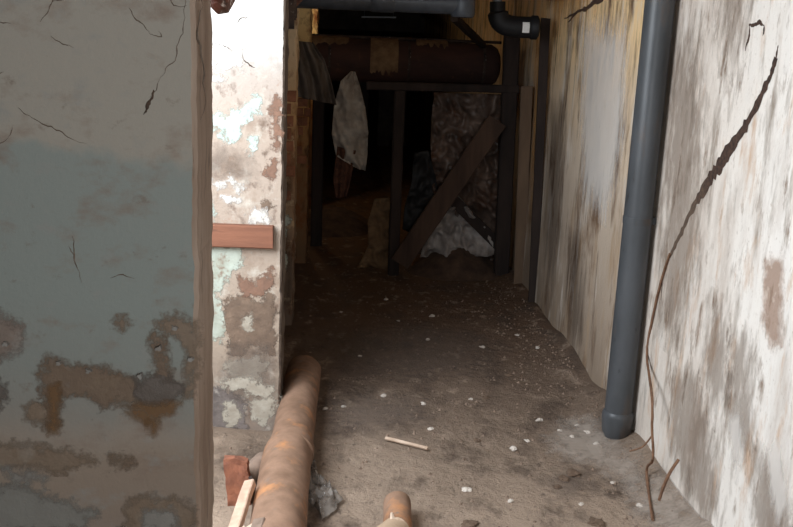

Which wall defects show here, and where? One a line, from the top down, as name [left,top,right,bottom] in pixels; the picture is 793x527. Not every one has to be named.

crack [129,0,255,120]
crack [564,0,603,22]
crack [745,19,765,51]
crack [19,108,86,144]
crack [670,47,778,258]
peeling [212,176,245,204]
peeling [248,200,277,225]
spalling [212,247,281,430]
peeling [23,312,203,431]
spalling [223,455,251,506]
water stain [769,443,786,515]